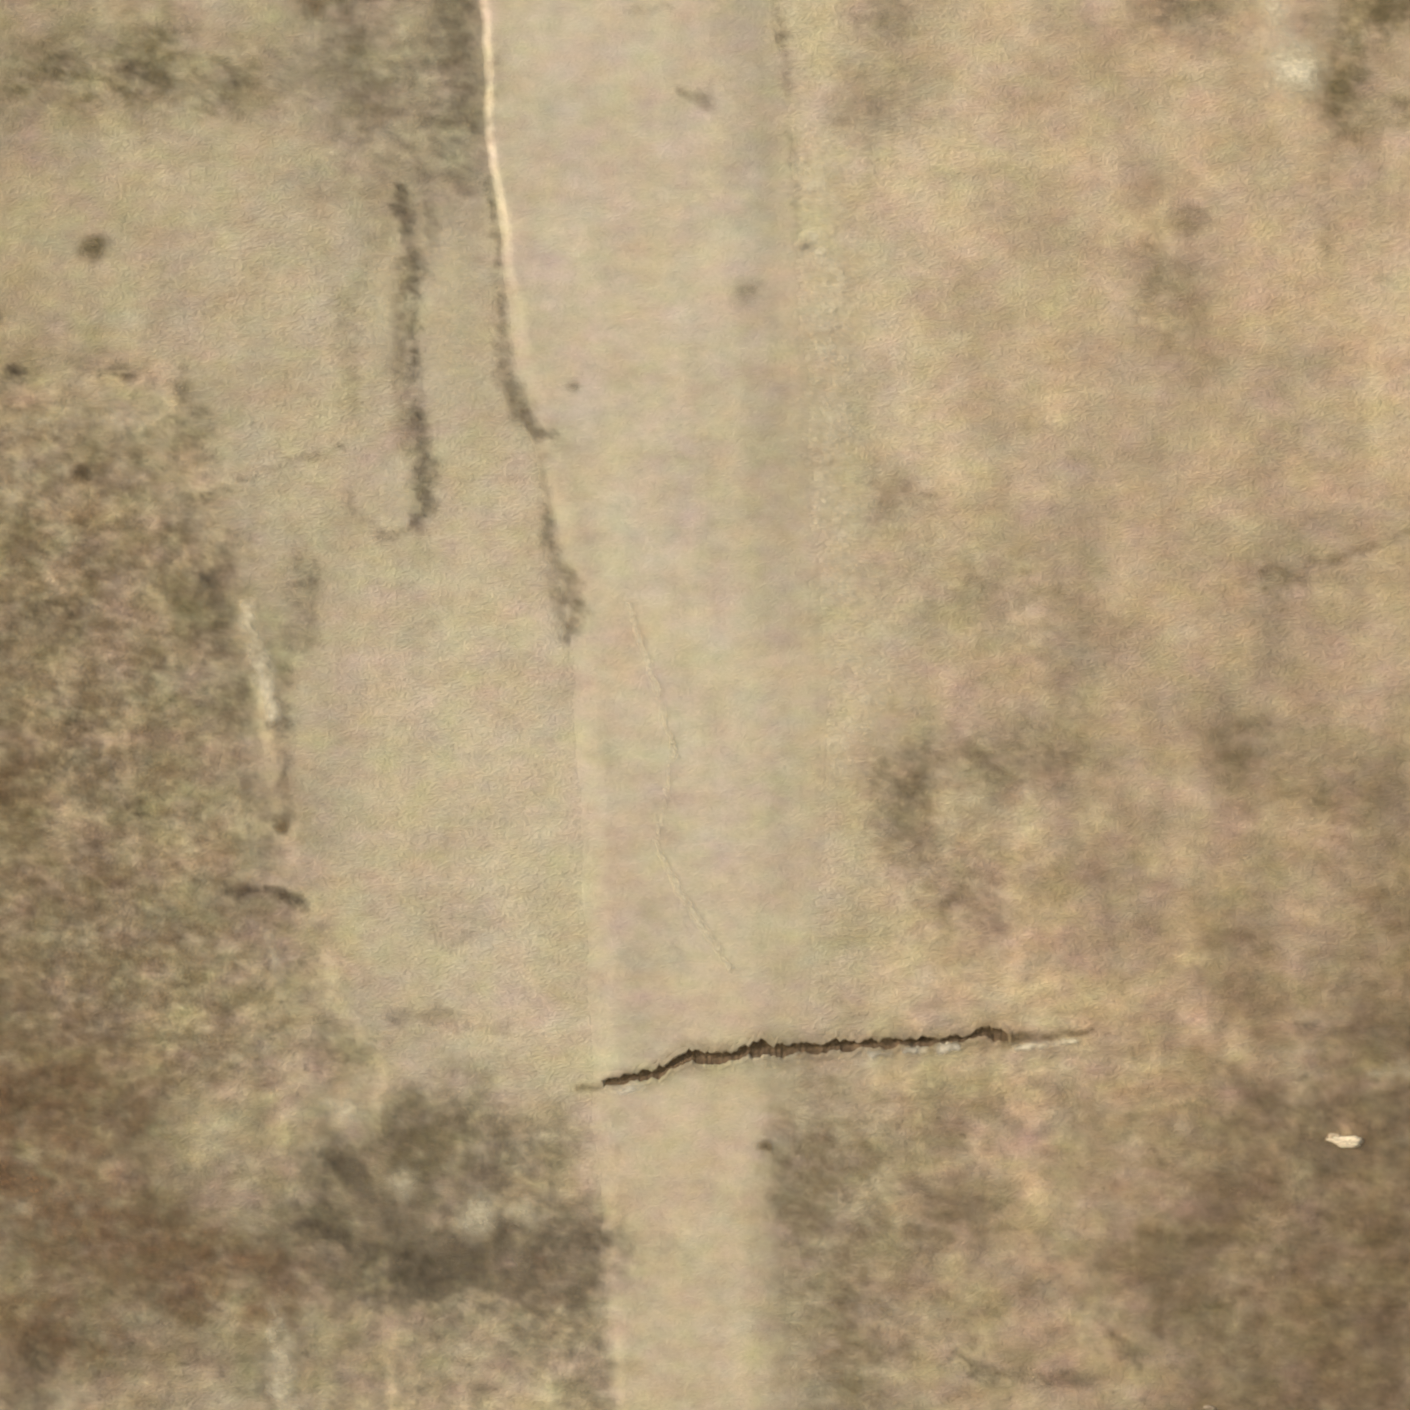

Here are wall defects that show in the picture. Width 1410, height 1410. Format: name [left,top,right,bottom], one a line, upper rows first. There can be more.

damp [241,606,277,721]
crack [601,1017,1087,1093]
damp [296,1102,605,1347]